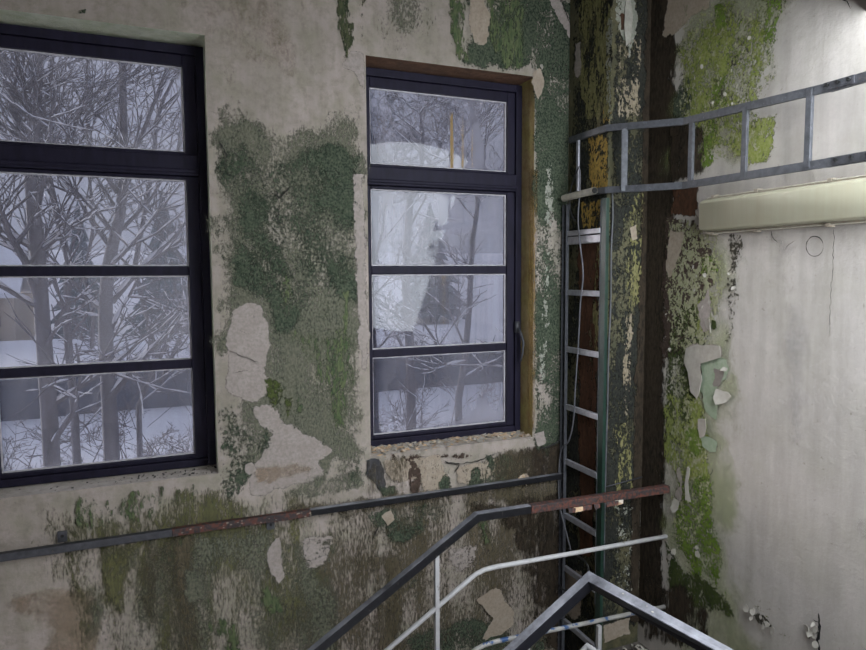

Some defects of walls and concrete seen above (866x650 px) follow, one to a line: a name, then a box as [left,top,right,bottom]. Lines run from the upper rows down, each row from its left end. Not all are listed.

peeling [225,303,332,496]
damp [17,0,704,650]
peeling [660,214,744,561]
peeling [267,537,285,584]
peeling [302,535,333,568]